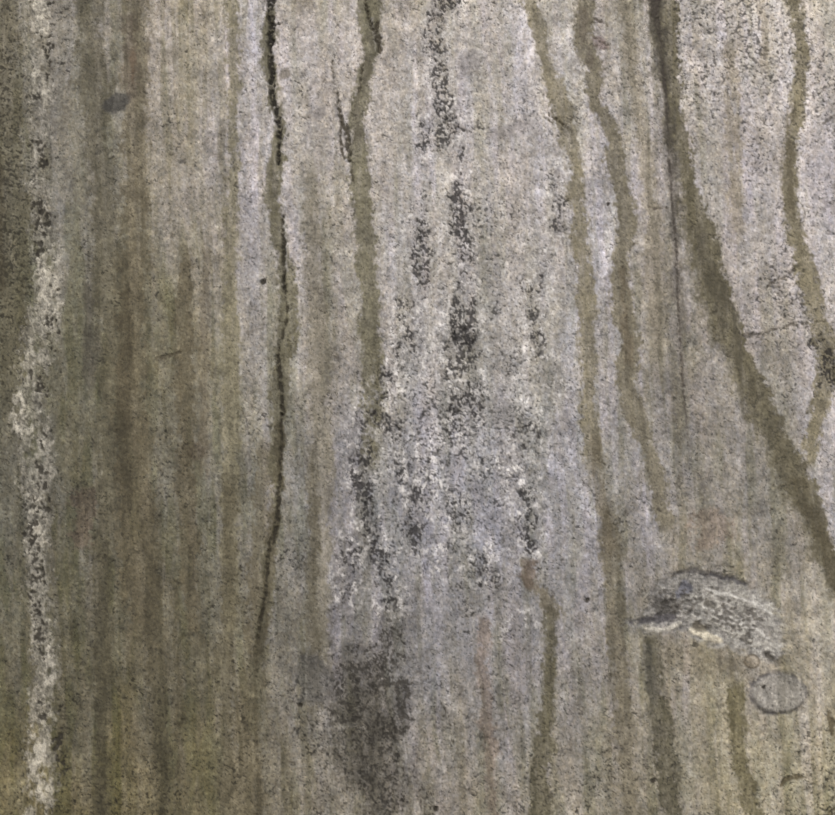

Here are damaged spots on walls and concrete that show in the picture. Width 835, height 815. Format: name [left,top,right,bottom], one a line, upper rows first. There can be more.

crack [266,0,284,166]
crack [330,0,383,183]
water stain [454,46,486,78]
water stain [0,0,340,815]
water stain [482,0,835,815]
crack [253,214,289,815]
spalling [616,563,794,669]